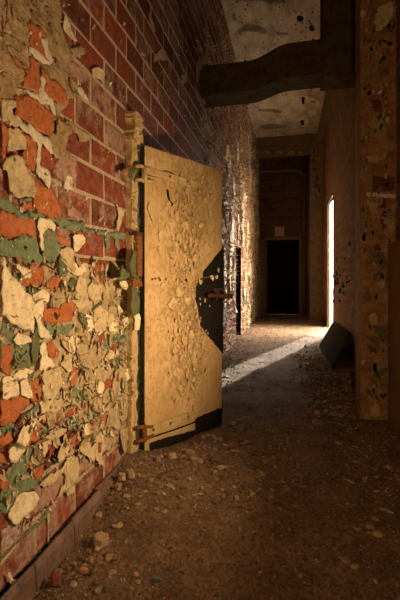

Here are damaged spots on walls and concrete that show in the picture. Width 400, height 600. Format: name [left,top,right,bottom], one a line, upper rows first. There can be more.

peeling [0,0,141,536]
peeling [158,0,303,406]
peeling [360,0,397,304]